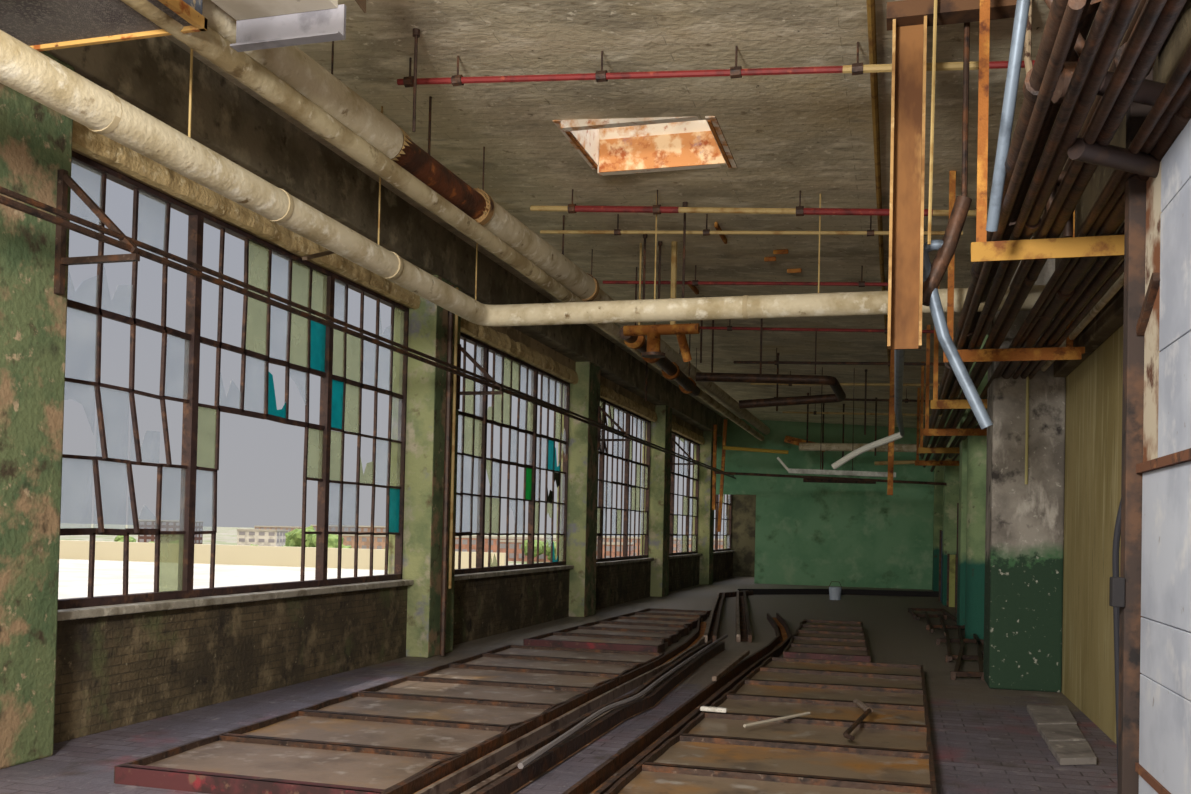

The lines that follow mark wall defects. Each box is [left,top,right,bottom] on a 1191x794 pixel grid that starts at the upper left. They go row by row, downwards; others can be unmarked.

corrosion [1143,162,1162,462]